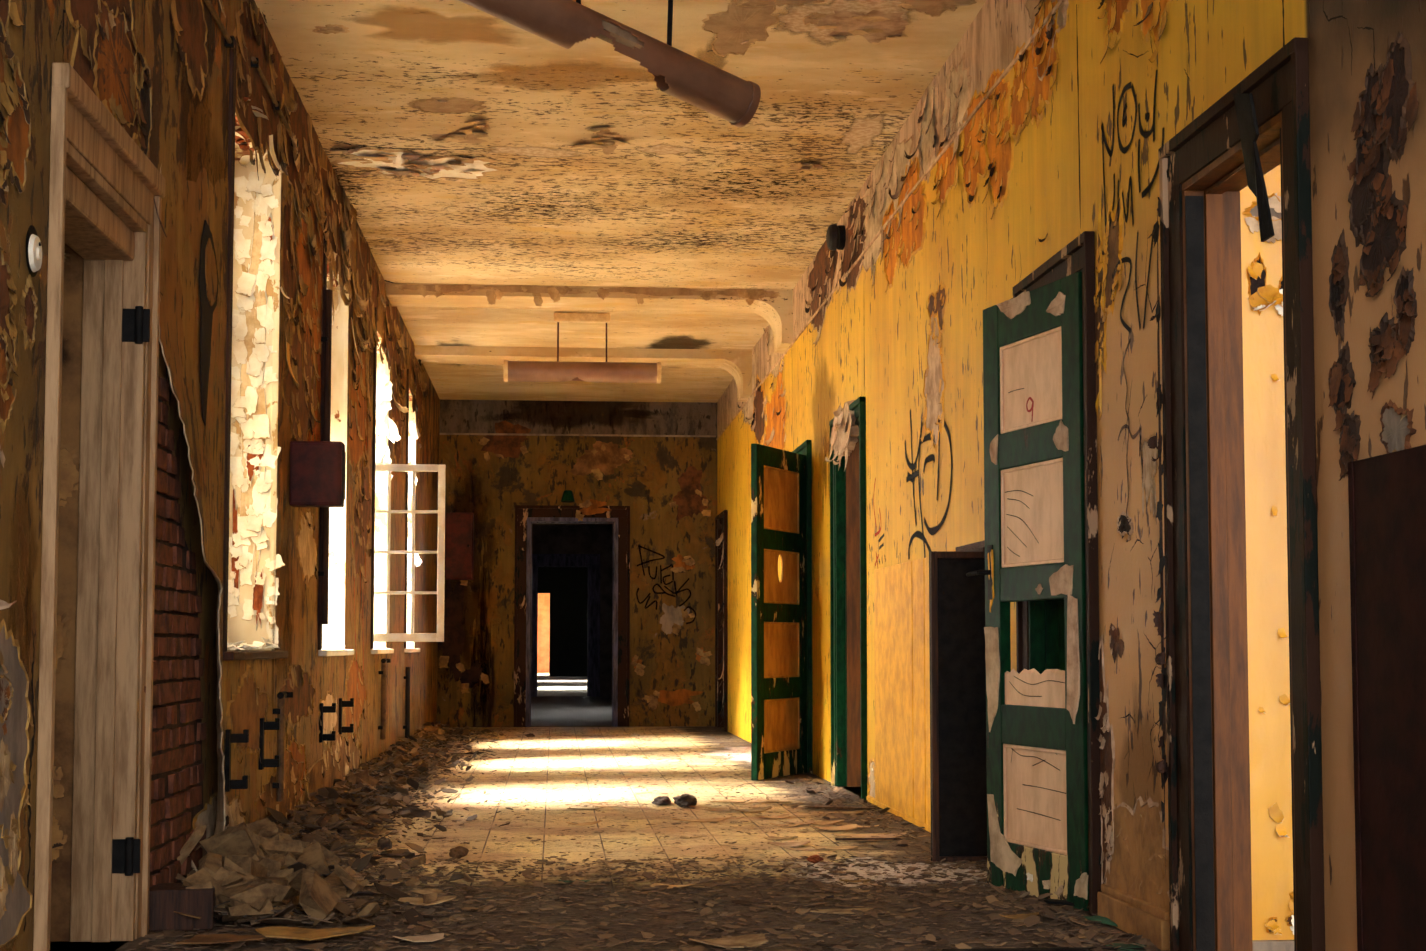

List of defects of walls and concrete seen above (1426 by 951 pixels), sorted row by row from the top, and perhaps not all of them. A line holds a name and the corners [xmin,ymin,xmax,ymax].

peeling [65,0,152,149]
peeling [701,0,977,57]
peeling [1097,0,1153,64]
water stain [442,98,883,253]
peeling [805,0,1069,347]
peeling [1328,31,1419,481]
peeling [144,0,503,888]